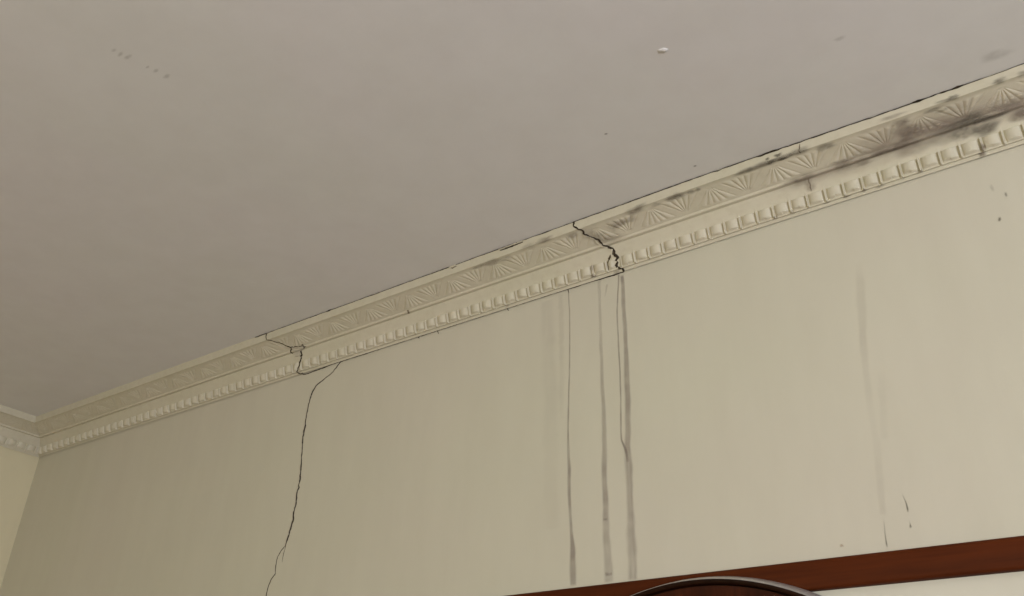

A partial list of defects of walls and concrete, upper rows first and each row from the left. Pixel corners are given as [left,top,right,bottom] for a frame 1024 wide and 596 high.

crack [255,63,1024,596]
leakage [963,112,1024,133]